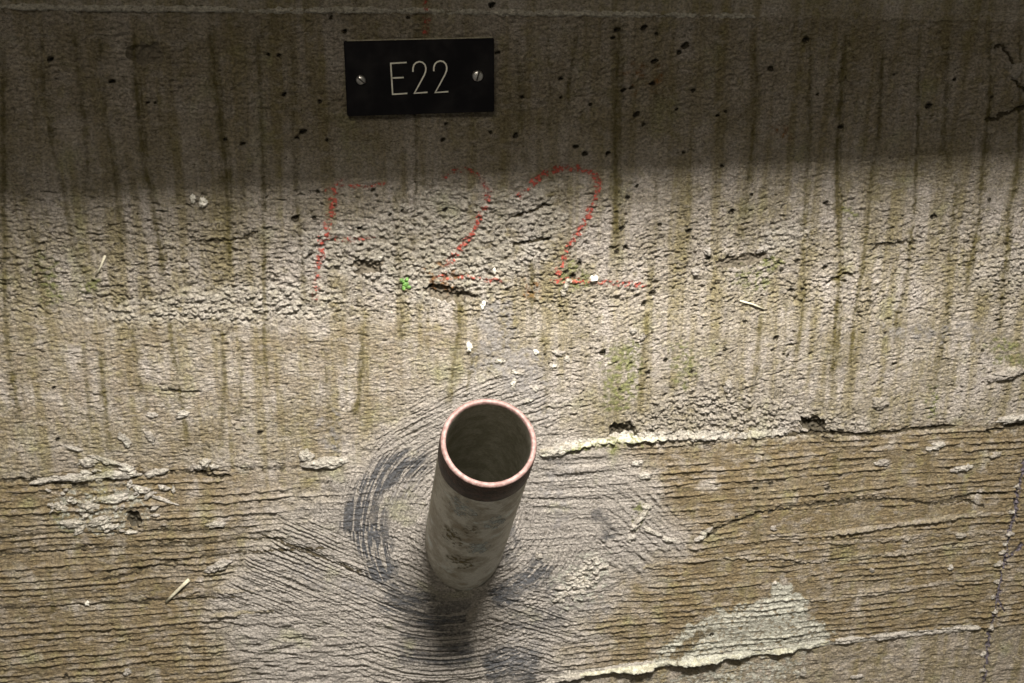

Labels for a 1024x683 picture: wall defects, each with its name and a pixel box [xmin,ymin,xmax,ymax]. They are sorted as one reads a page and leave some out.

peeling [28,445,179,536]
crack [706,460,1024,683]